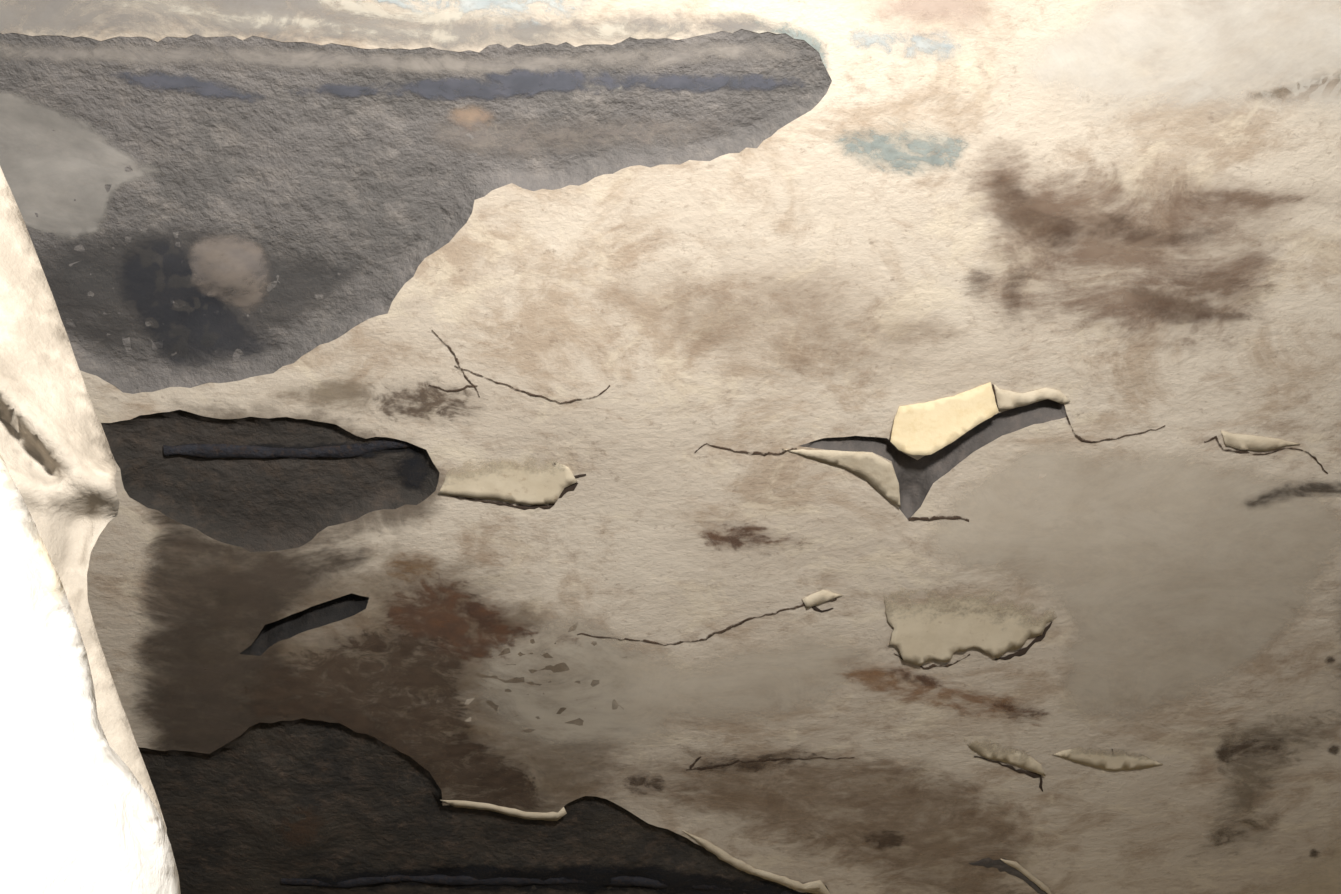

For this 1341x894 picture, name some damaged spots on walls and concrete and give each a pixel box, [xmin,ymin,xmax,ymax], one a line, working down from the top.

spalling [0,29,832,394]
water stain [983,169,1274,329]
crack [429,330,610,404]
spalling [101,410,586,552]
peeling [736,382,1165,522]
spalling [240,593,369,656]
rust [387,555,537,660]
crack [577,590,842,646]
peeling [884,592,1053,670]
rust [848,670,1045,716]
spalling [138,718,831,894]
crack [969,858,1051,894]